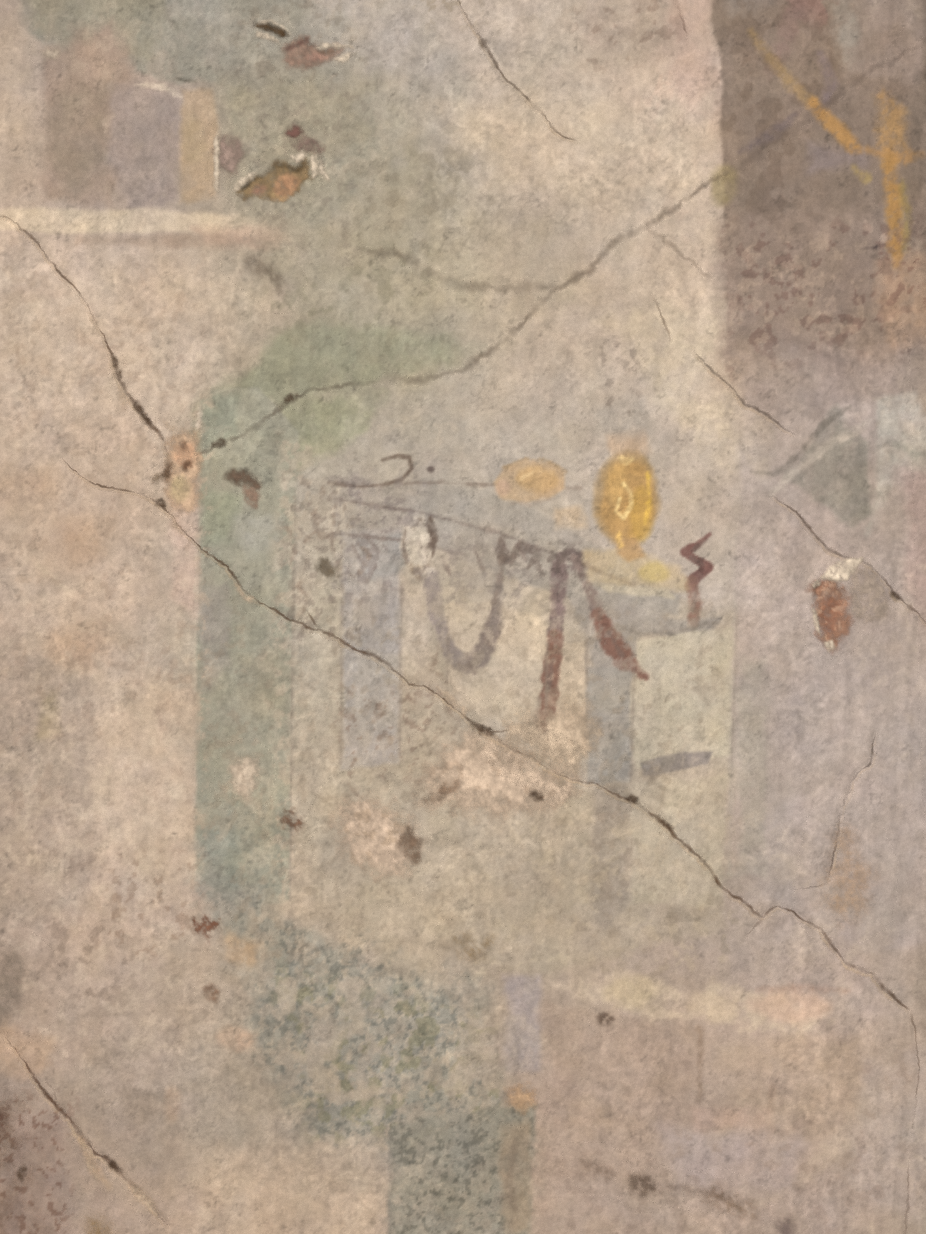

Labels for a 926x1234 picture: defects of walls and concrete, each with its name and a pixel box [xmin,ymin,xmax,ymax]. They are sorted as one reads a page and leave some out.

spalling [257,20,349,68]
spalling [214,126,329,201]
crack [134,405,173,432]
crack [158,499,372,655]
spalling [812,558,887,649]
crack [411,684,491,732]
crack [627,796,697,855]
crack [25,1062,72,1122]
crack [88,1150,152,1210]